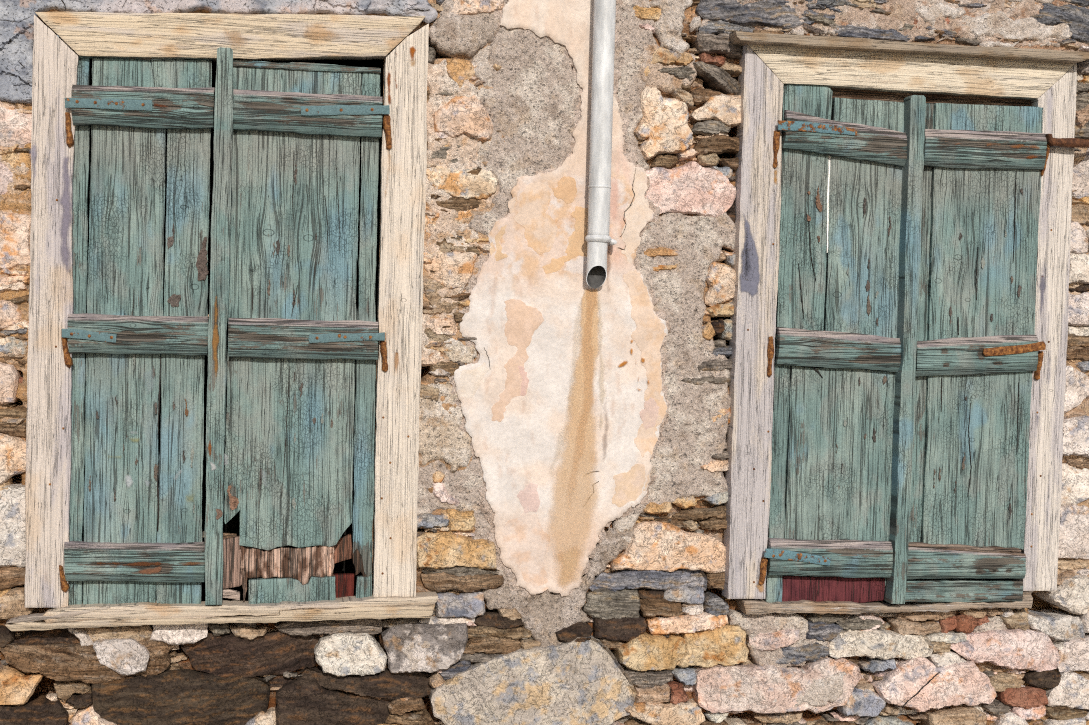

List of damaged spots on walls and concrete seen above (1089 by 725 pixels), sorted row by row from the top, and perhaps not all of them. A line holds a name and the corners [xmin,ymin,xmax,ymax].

corrosion [1012,134,1089,158]
flaking render [417,0,736,647]
damp [555,289,599,531]